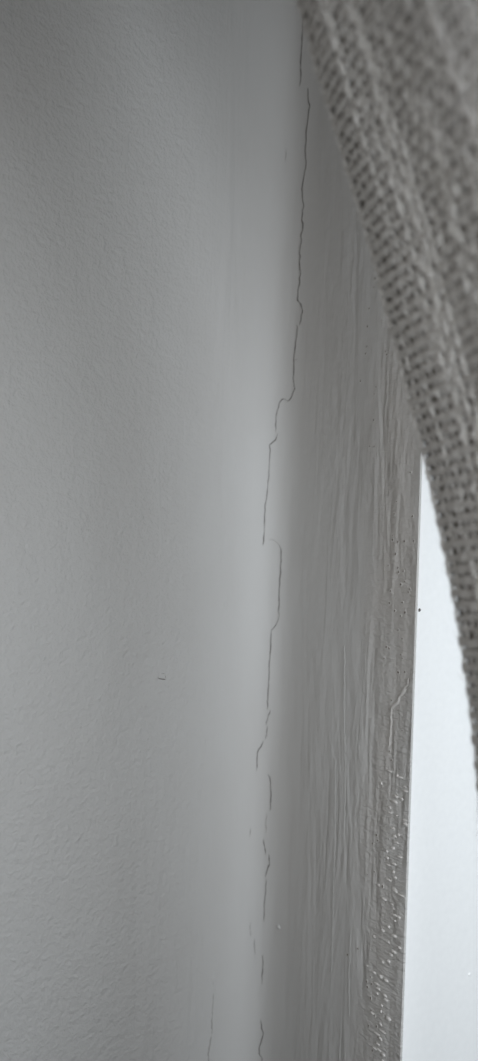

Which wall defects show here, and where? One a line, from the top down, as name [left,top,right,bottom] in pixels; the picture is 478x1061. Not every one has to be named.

crack [250,27,310,976]